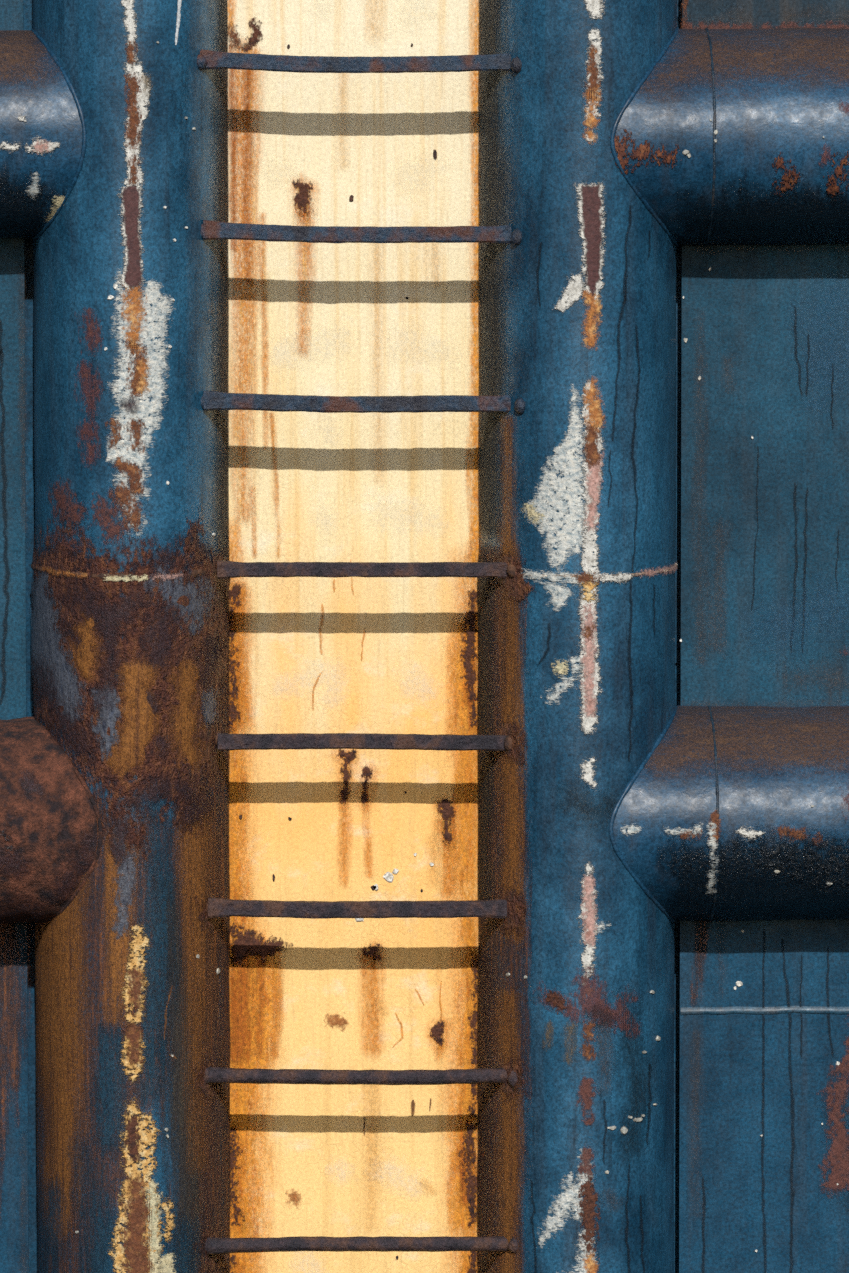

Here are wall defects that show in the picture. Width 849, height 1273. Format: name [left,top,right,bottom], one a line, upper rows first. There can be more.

corrosion [228,0,263,54]
peeling [583,0,606,142]
peeling [104,0,175,535]
corrosion [292,179,313,226]
peeling [552,182,606,350]
peeling [521,378,677,734]
corrosion [0,410,293,1273]
corrosion [338,749,373,883]
corrosion [437,412,639,1273]
peeling [120,924,150,1082]
corrosion [430,1020,444,1049]
peeling [108,1097,176,1273]